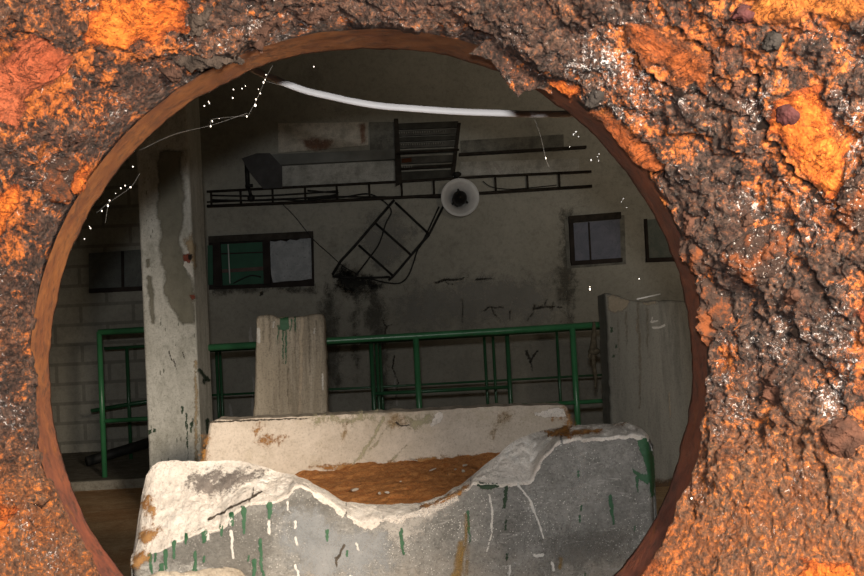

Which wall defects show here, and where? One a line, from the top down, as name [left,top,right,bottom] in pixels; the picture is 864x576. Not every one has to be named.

rust [82,0,190,50]
rust [748,0,864,26]
rust [0,34,73,130]
rust [548,80,580,99]
rust [70,162,92,194]
rust [590,107,664,174]
rust [766,82,854,203]
peeling [157,150,197,324]
leakage [274,285,392,425]
rust [131,495,162,569]
crack [208,487,262,521]
spalling [131,408,655,564]